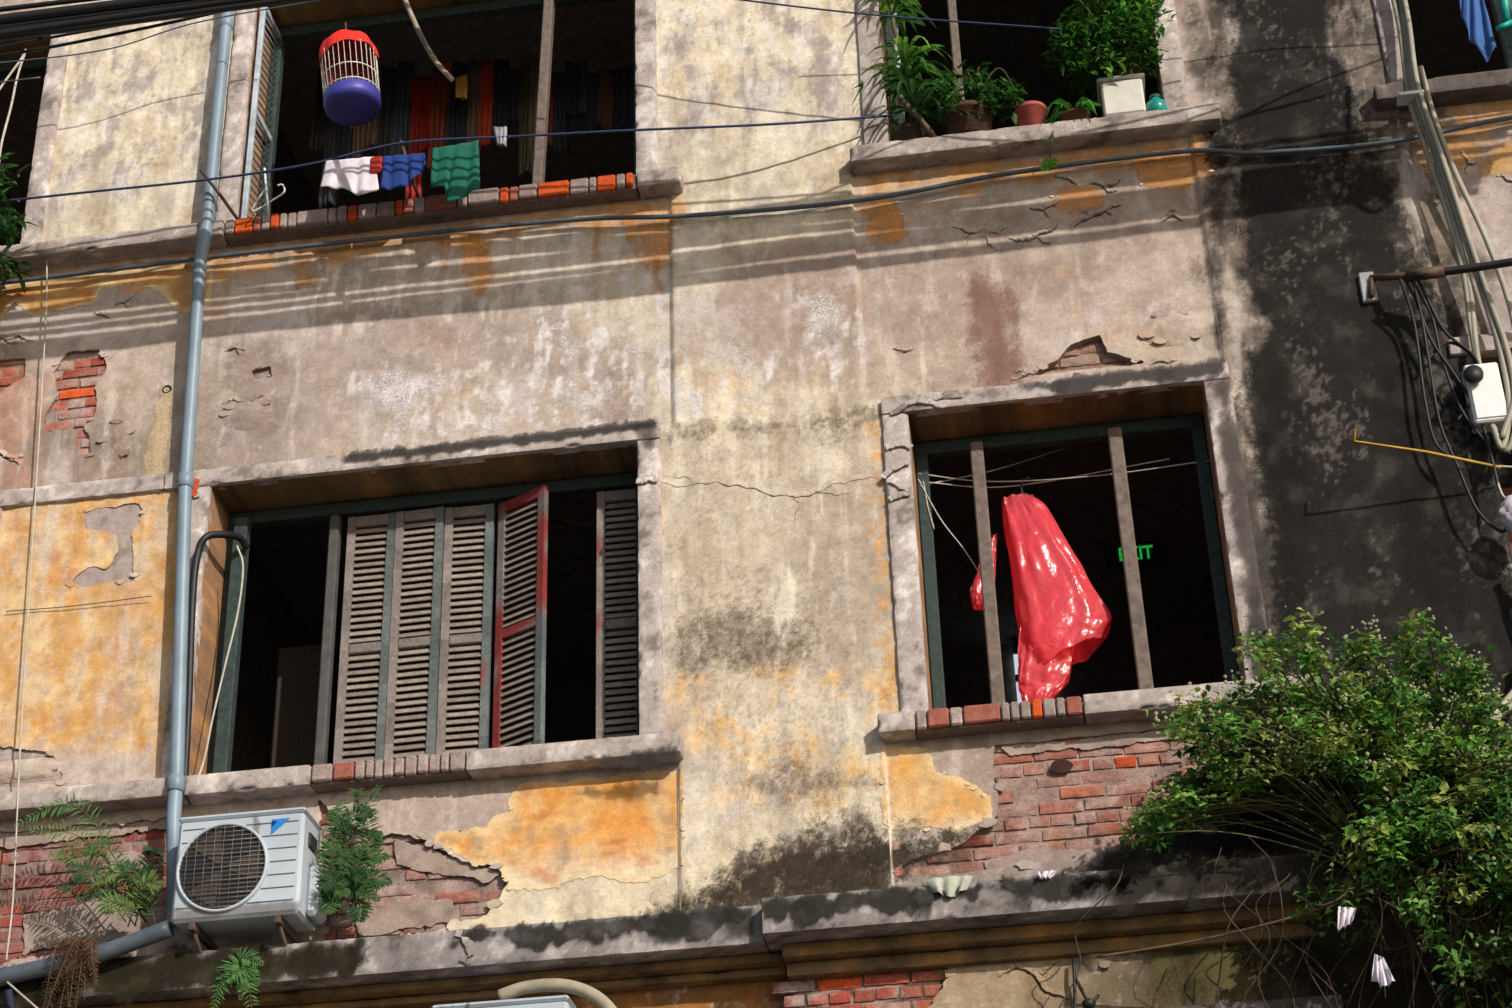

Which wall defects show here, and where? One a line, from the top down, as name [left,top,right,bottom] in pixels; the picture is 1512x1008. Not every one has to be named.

flaking render [44,351,109,457]
water stain [809,295,840,337]
flaking render [1036,340,1142,375]
water stain [972,0,1512,913]
flaking render [66,503,147,587]
water stain [674,614,804,667]
water stain [591,747,678,769]
flaking render [879,726,1238,877]
flaking render [0,812,180,965]
peeling [316,769,686,941]
water stain [451,810,983,951]
flaking render [770,964,957,1008]